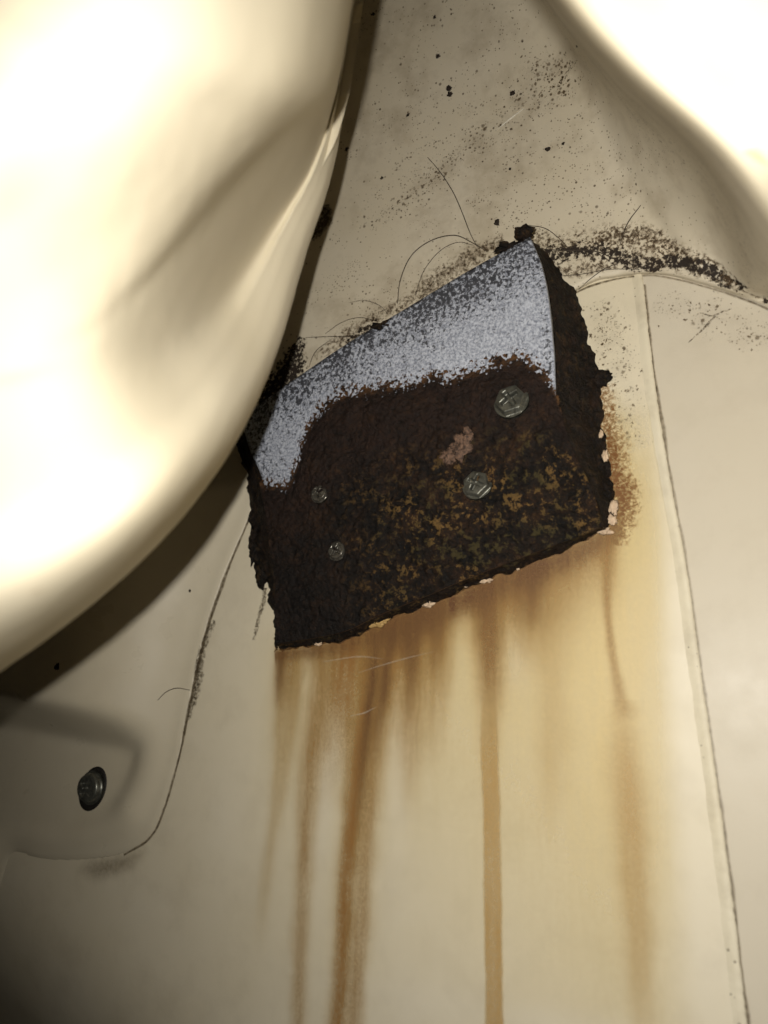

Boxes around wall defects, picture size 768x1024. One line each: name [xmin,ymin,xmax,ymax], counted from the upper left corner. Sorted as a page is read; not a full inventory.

rust [492,223,535,254]
rust [370,319,389,330]
rust [248,346,653,1024]